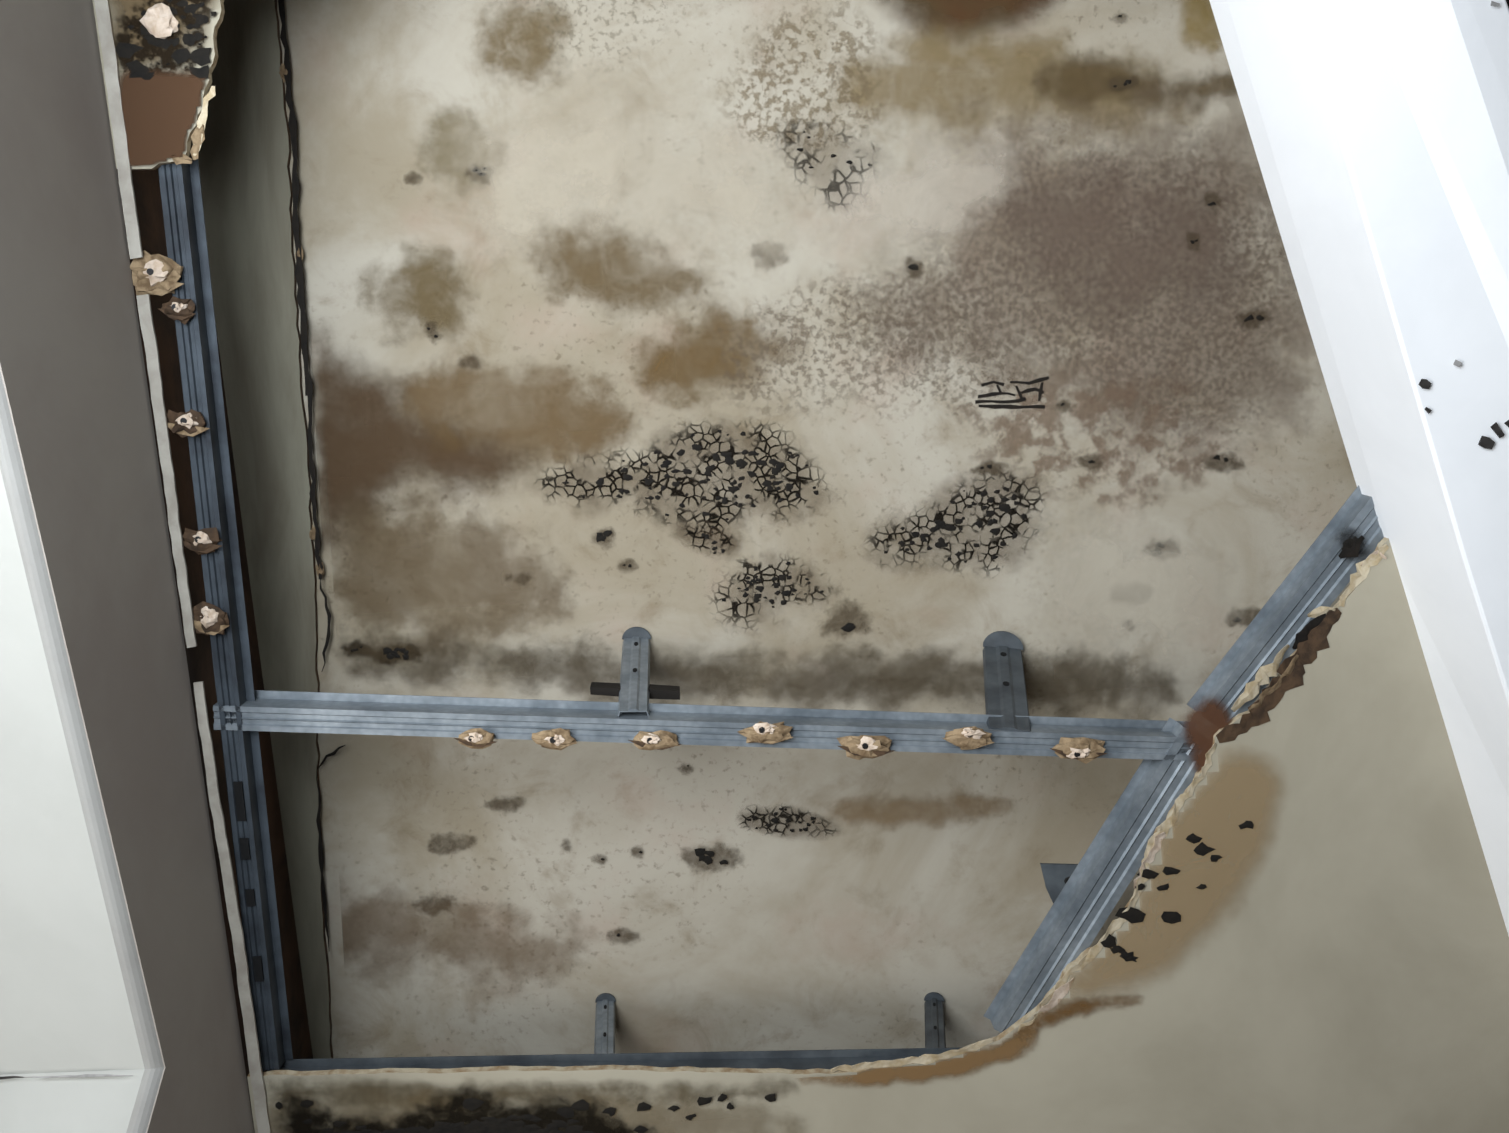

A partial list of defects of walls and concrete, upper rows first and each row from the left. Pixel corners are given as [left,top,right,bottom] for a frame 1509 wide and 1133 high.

water stain [110,0,216,80]
water stain [849,0,1236,122]
spalling [117,72,267,1133]
water stain [316,357,824,622]
mould [871,376,1241,569]
peeling [1231,606,1336,712]
peeling [1338,535,1387,566]
rust [1185,700,1232,772]
spalling [259,731,313,1059]
water stain [808,760,1275,1086]
peeling [1038,977,1075,1014]
water stain [275,1083,734,1133]